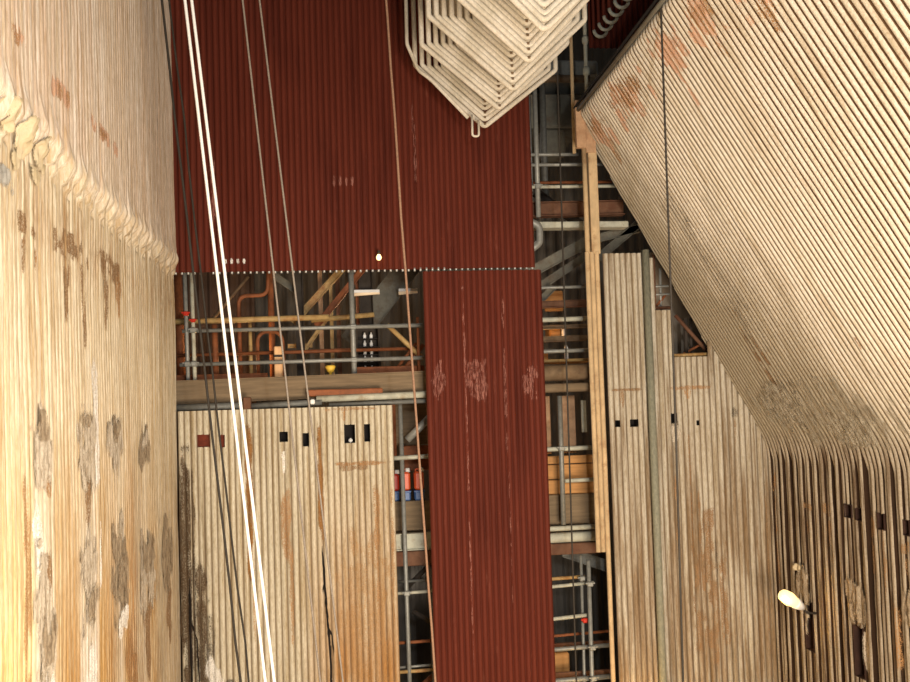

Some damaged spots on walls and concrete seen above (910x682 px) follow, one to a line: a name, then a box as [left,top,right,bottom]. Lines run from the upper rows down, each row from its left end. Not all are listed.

rust [588,63,659,164]
rust [647,0,733,108]
rust [734,0,783,31]
water stain [90,359,100,489]
water stain [190,551,224,682]
rust [280,488,295,647]
rust [336,484,396,682]